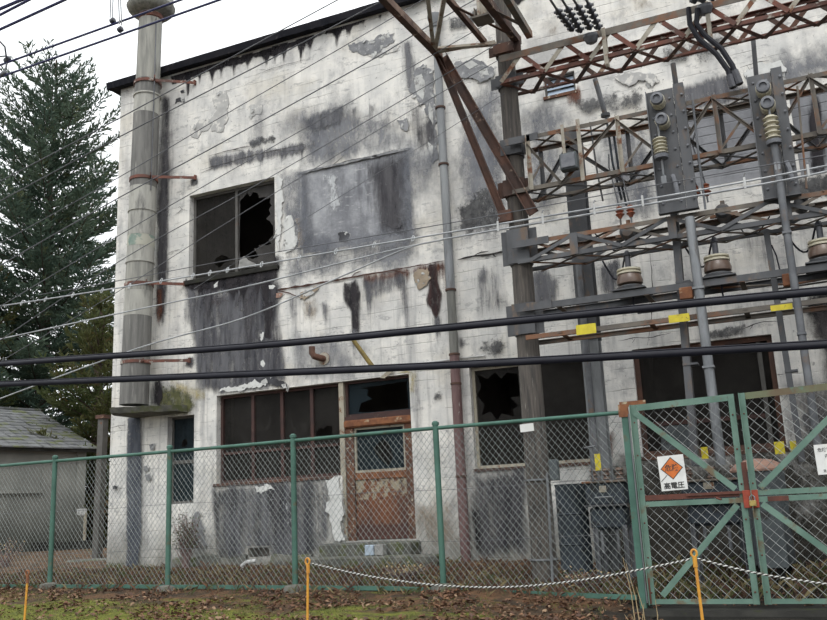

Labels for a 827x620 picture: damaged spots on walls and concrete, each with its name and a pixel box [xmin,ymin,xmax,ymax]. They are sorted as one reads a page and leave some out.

leakage [450,9,477,30]
leakage [156,97,170,322]
peeling [273,176,305,253]
leakage [284,109,435,333]
leakage [185,256,285,394]
corrosion [364,263,445,283]
leakage [426,263,442,337]
peeling [219,377,289,393]
peeling [325,476,347,541]